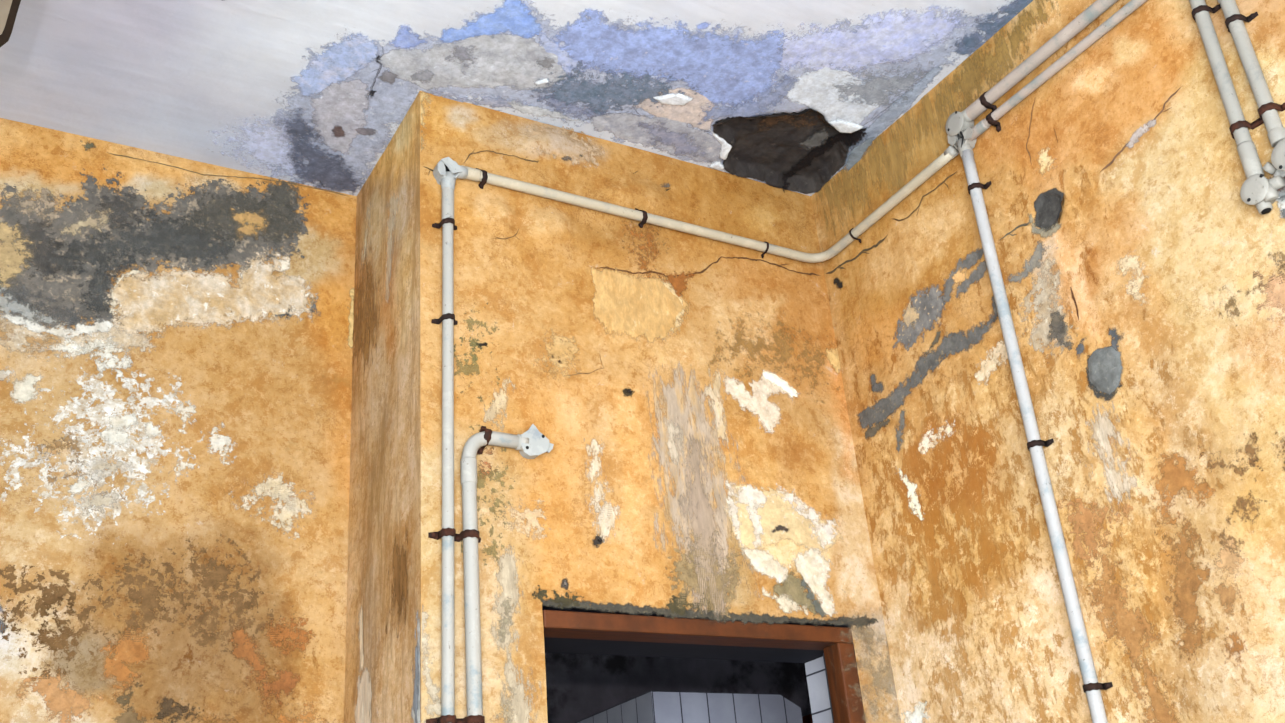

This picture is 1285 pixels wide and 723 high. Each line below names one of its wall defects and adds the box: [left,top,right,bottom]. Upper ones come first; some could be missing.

peeling [212,0,995,194]
crack [600,172,956,280]
flaking render [1270,170,1285,218]
damp [0,109,360,680]
damp [352,248,380,372]
peeling [591,267,690,343]
peeling [724,370,798,433]
peeling [858,248,998,452]
damp [647,313,827,623]
damp [385,534,408,638]
peeling [725,480,843,617]
damp [115,675,200,723]